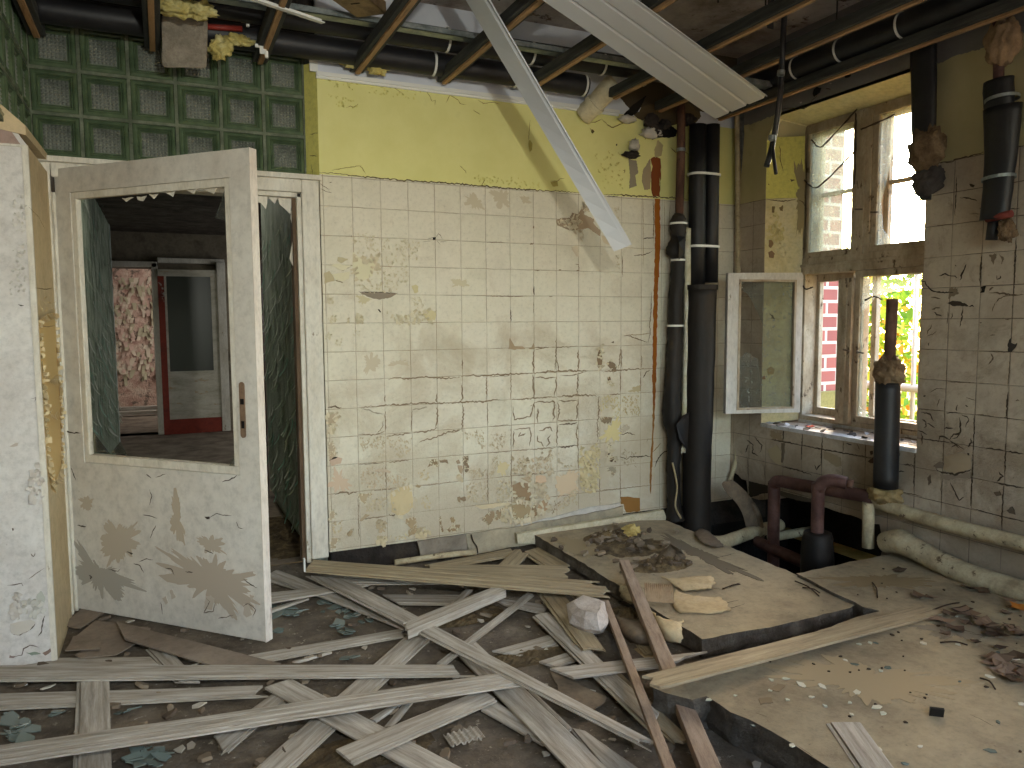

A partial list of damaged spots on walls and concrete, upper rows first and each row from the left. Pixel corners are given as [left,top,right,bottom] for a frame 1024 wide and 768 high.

spalling [712,54,737,68]
spalling [621,82,704,190]
spalling [557,201,610,245]
crack [937,152,983,226]
crack [487,264,579,320]
rust [621,157,661,512]
peeling [39,308,67,493]
crack [328,292,667,536]
crack [899,242,1023,527]
peeling [387,482,421,538]
spalling [428,455,471,474]
spalling [457,475,553,527]